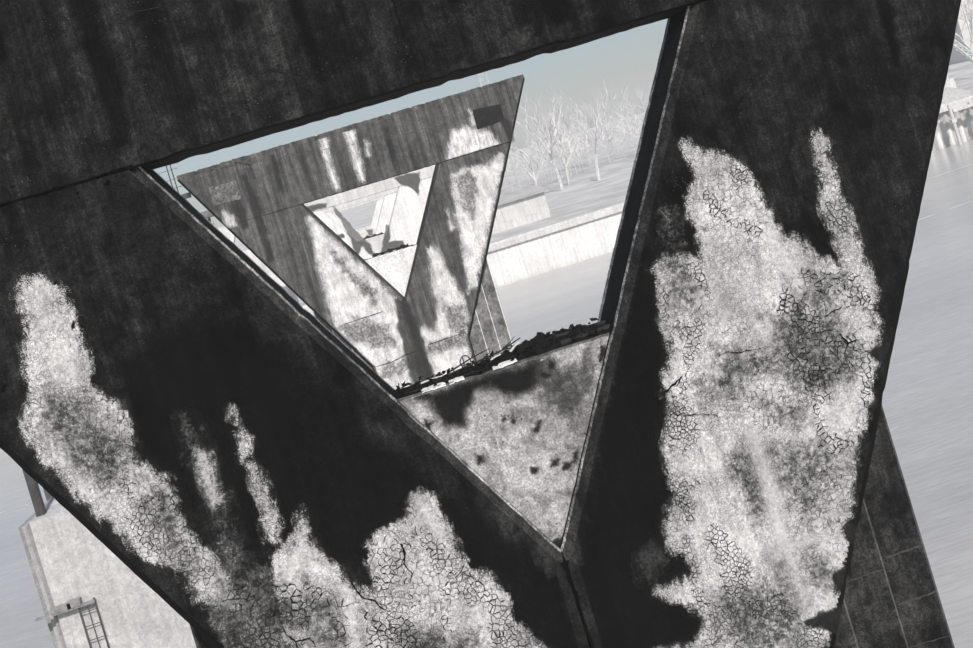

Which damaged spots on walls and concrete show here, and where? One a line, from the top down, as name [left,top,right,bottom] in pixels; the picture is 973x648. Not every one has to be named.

leakage [782,189,834,260]
crack [825,306,862,362]
crack [664,376,715,416]
leakage [118,320,607,648]
crack [396,543,413,581]
crack [350,581,391,612]
crack [559,560,595,648]
crack [282,627,316,648]